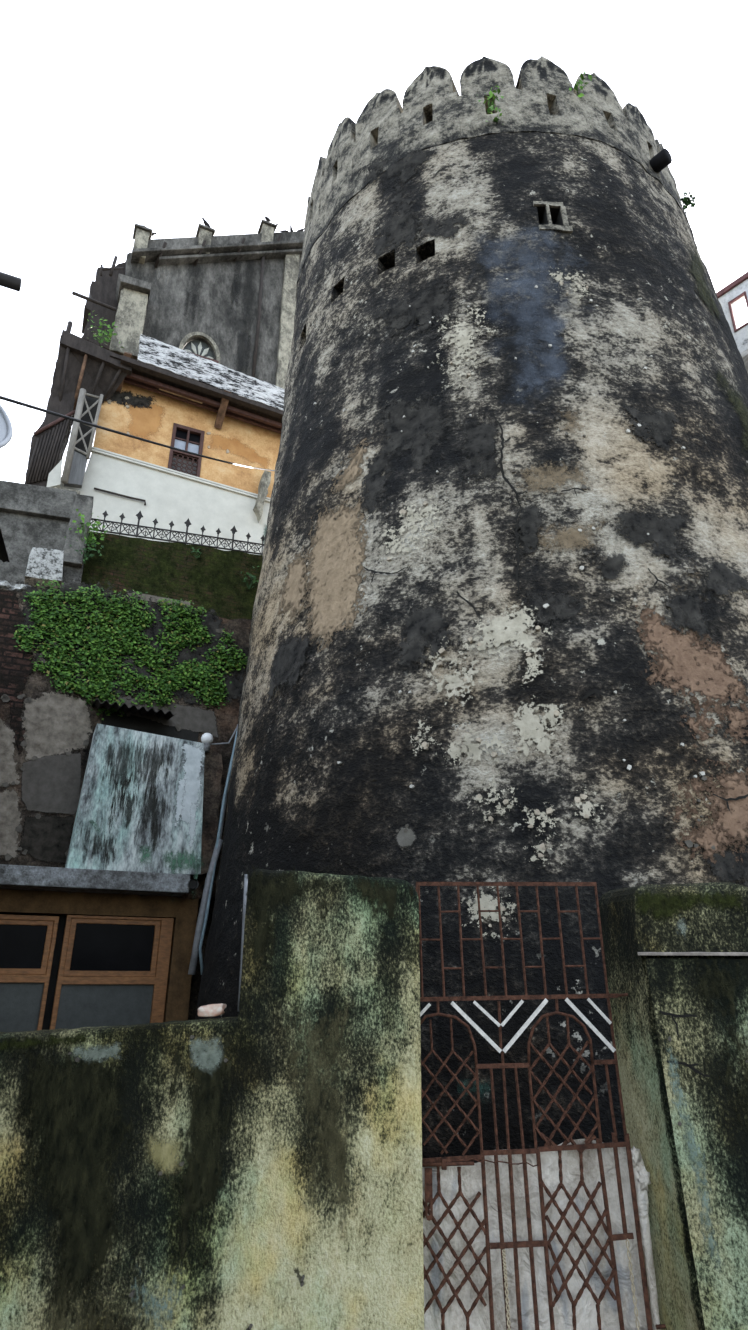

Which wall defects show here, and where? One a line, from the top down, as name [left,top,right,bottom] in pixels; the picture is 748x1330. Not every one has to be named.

leakage [231,260,256,372]
leakage [370,219,464,259]
leakage [385,278,508,389]
leakage [535,266,598,308]
peeling [275,437,373,653]
leakage [362,415,454,575]
leakage [615,519,685,564]
leakage [81,738,172,869]
leakage [391,602,605,865]
peeling [632,565,748,870]
leakage [13,1046,140,1330]
leakage [169,1037,236,1272]